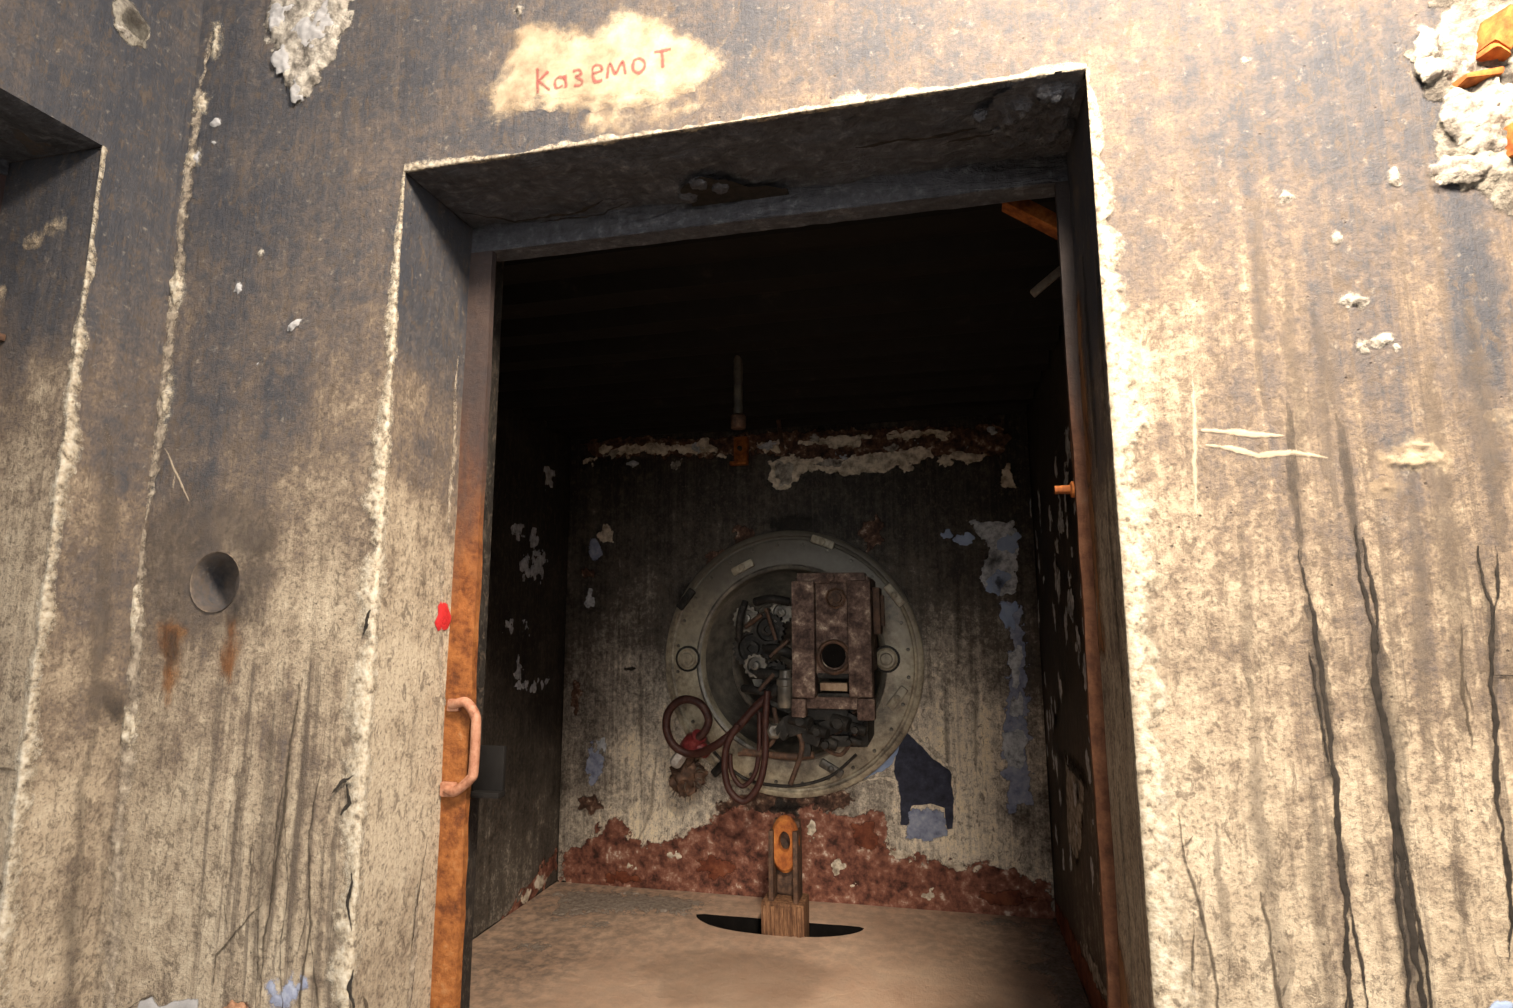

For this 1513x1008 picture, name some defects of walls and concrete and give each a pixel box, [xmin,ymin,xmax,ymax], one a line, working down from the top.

flaking render [262,0,354,104]
spalling [1404,0,1513,216]
flaking render [103,22,221,1008]
corrosion [161,623,184,691]
corrosion [222,620,234,677]
peeling [501,423,1101,920]
crack [1298,549,1369,1008]
crack [1354,524,1433,1008]
crack [1460,546,1513,959]
peeling [266,975,308,1008]